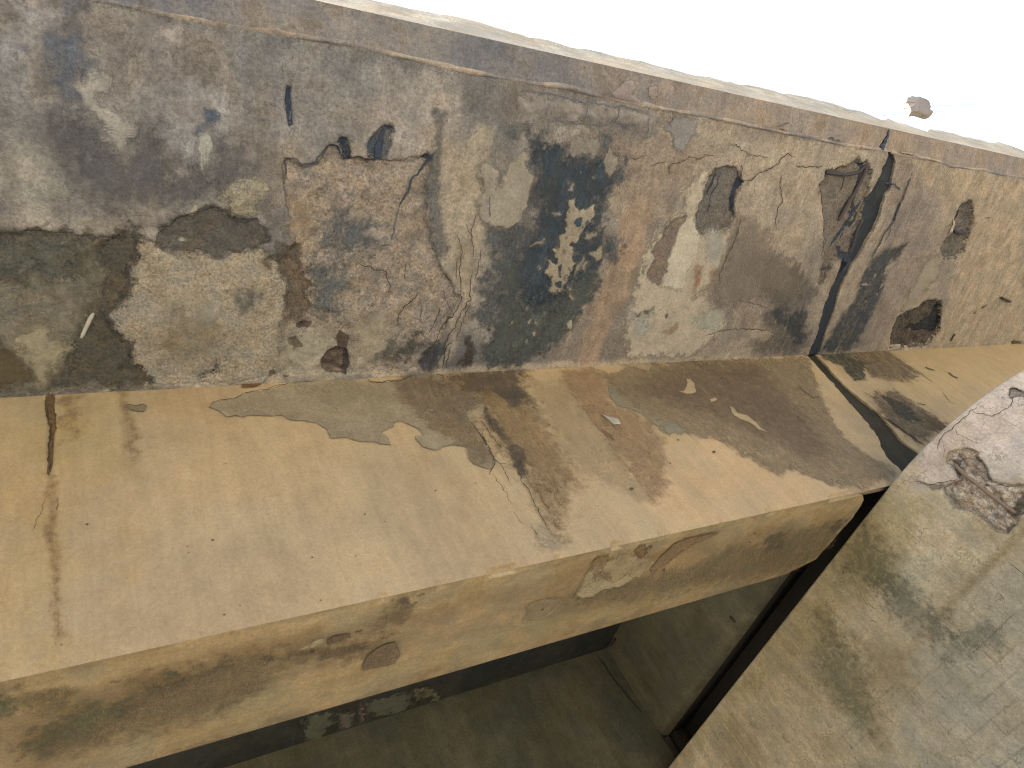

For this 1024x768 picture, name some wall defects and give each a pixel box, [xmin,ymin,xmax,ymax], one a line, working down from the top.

crack [515,86,821,229]
spalling [0,125,495,469]
crack [357,149,481,368]
damp [418,342,446,372]
damp [449,123,627,528]
spalling [647,165,744,286]
spalling [817,159,872,284]
spalling [889,300,941,348]
spalling [940,200,973,260]
crack [885,367,1022,487]
spalling [923,448,1024,534]
damp [0,593,424,760]